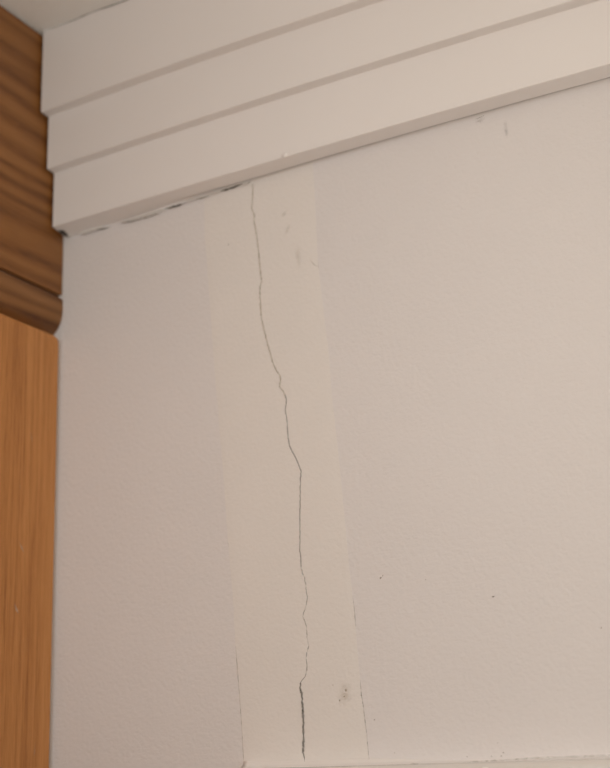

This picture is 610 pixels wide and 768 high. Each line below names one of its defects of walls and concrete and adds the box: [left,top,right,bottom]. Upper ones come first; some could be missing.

crack [285,396,302,519]
crack [299,647,309,761]